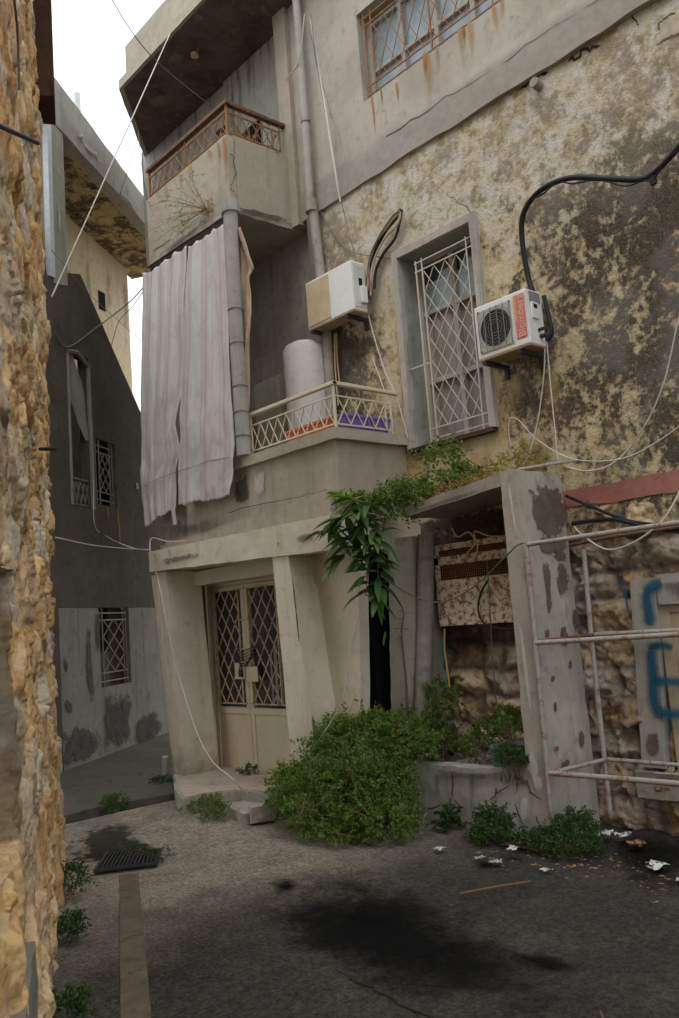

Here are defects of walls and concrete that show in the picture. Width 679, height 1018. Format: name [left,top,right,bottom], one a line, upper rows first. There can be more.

corrosion [423,47,438,76]
crack [385,0,597,137]
crack [631,13,675,40]
peeling [529,480,570,613]
damp [62,690,162,766]